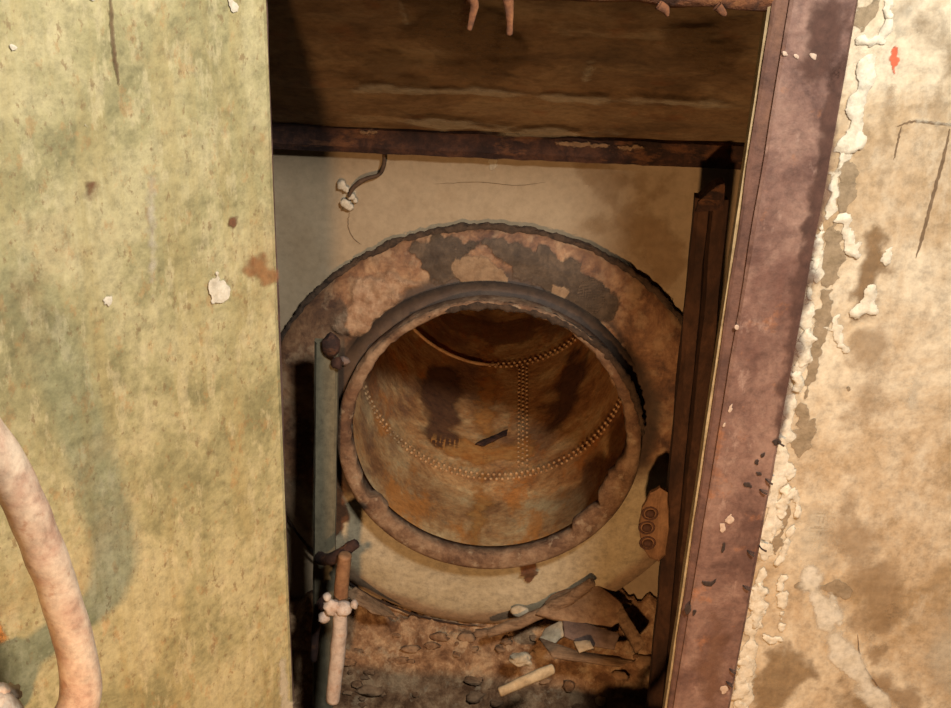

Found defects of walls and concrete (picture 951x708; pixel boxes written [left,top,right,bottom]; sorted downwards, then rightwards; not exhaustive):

corrosion [466,0,479,31]
corrosion [502,0,514,36]
corrosion [556,141,644,151]
corrosion [776,2,852,440]
peeling [772,0,894,457]
peeling [208,271,231,304]
corrosion [336,487,350,535]
corrosion [520,564,538,583]
peeling [749,469,852,644]
damp [800,566,890,708]
peeling [720,656,755,708]
damp [753,651,817,708]